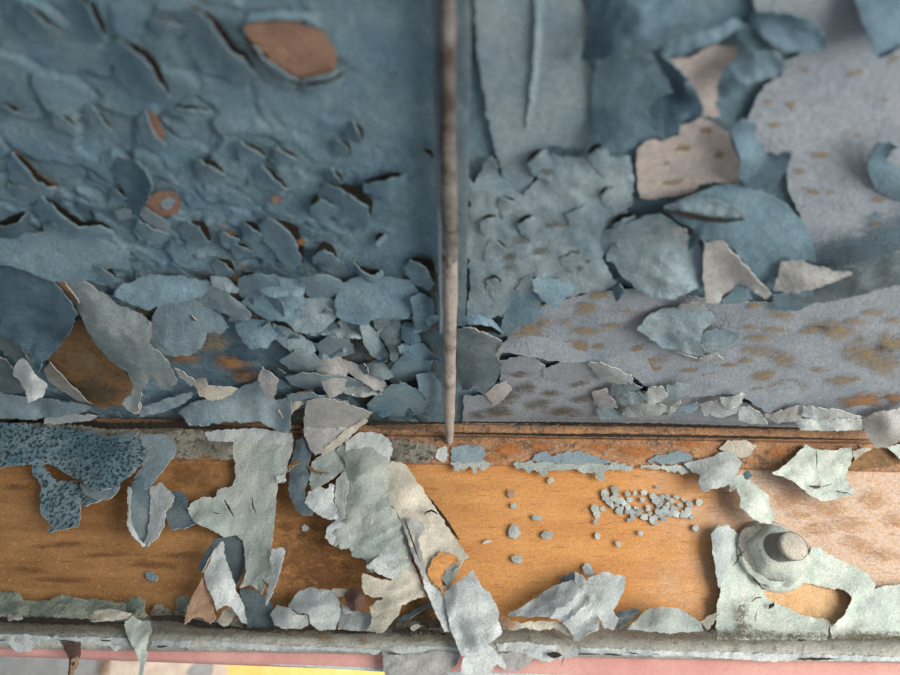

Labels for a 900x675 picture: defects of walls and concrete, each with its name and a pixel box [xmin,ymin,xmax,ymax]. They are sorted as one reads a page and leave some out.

peeling [15,2,60,41]
peeling [67,0,213,156]
peeling [150,6,346,94]
peeling [236,141,298,193]
peeling [462,0,900,501]
rust [562,291,620,351]
rust [721,303,805,390]
rust [801,309,900,375]
peeling [0,149,900,675]
rust [838,393,900,408]
rust [849,448,900,472]